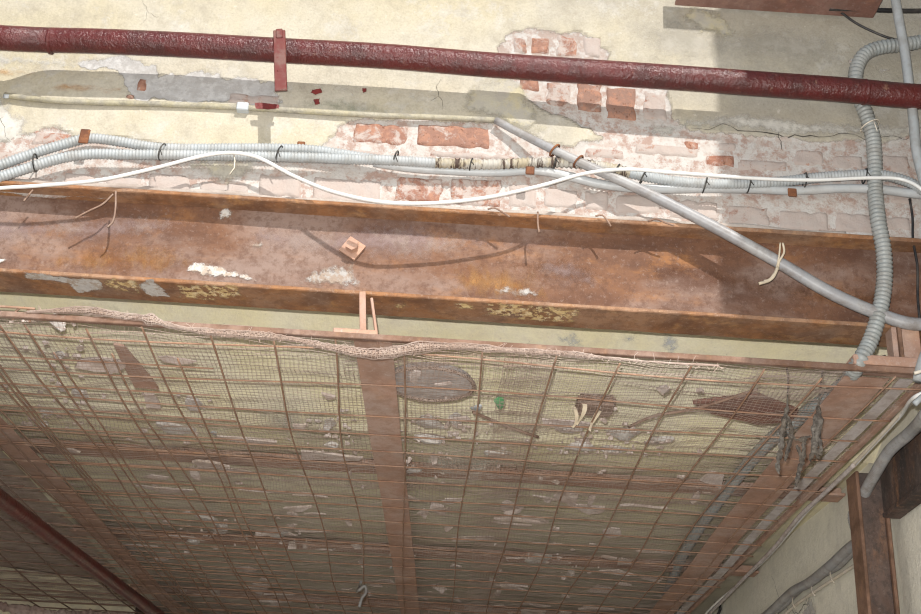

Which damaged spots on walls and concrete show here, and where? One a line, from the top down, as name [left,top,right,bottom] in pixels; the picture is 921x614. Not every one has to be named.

spalling [79,55,283,105]
spalling [497,28,609,60]
spalling [0,79,873,235]
spalling [878,124,921,238]